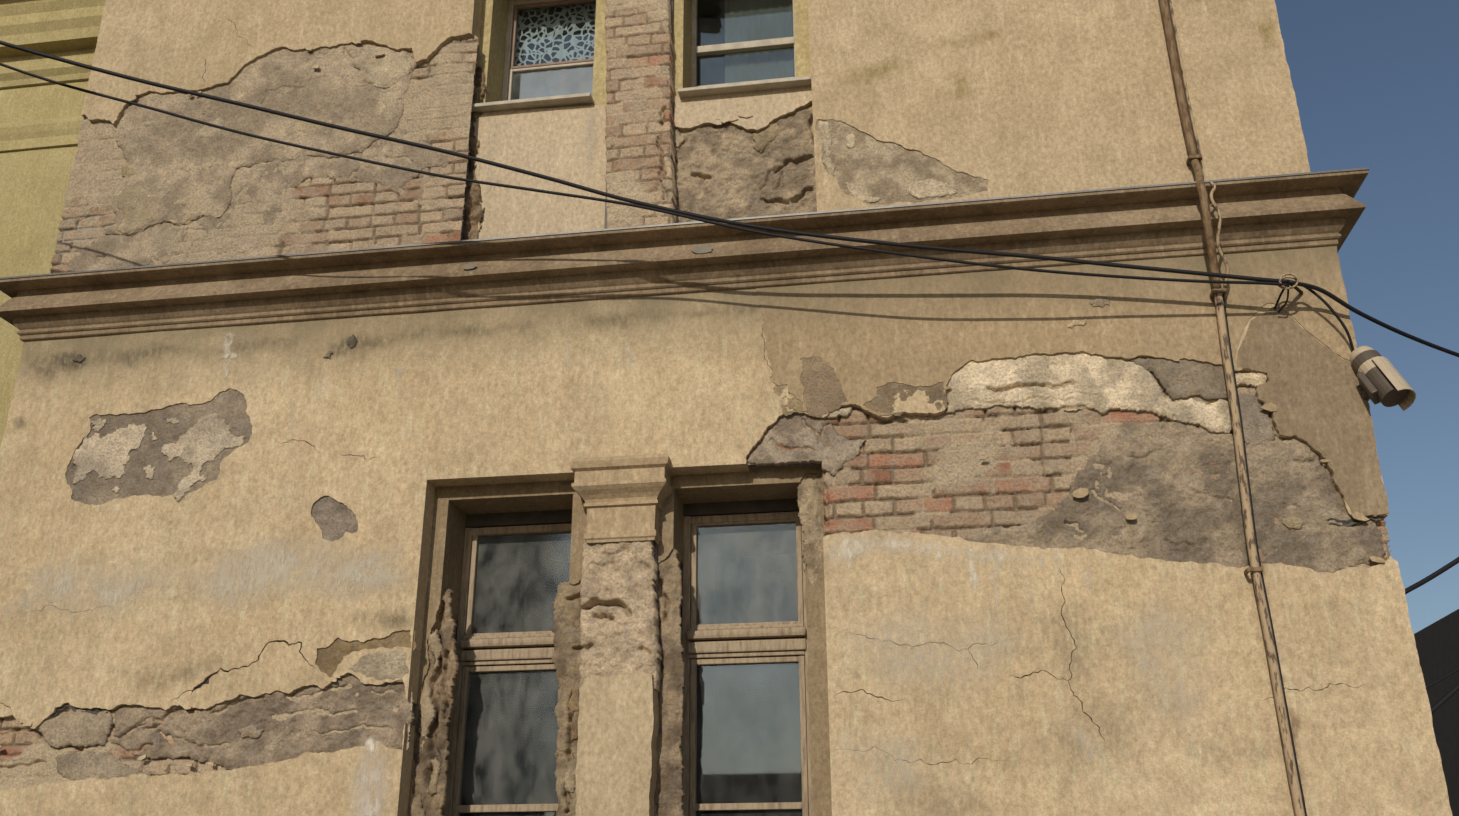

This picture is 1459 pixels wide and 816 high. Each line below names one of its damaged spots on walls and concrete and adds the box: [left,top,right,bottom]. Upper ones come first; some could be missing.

flaking render [50,34,489,273]
flaking render [605,0,989,229]
peeling [66,388,253,505]
peeling [312,496,358,542]
flaking render [746,352,1392,588]
flaking render [0,589,459,816]
crack [177,641,313,699]
flaking render [551,539,685,816]